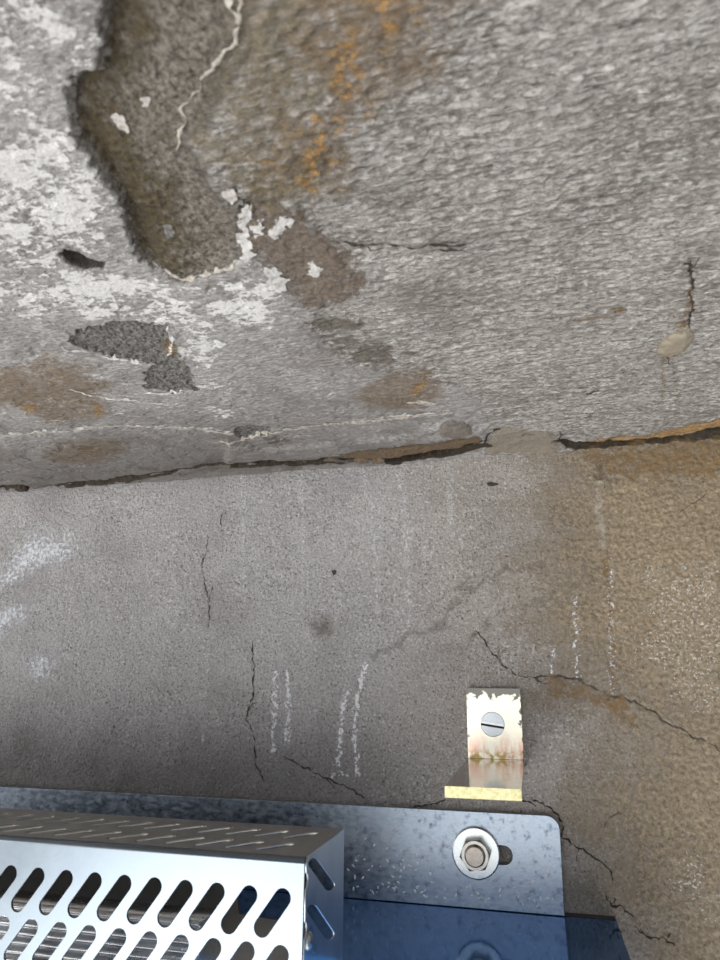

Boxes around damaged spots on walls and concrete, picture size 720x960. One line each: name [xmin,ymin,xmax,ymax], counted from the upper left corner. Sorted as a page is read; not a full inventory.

spalling [0,0,453,446]
crack [684,256,700,332]
crack [0,429,500,492]
crack [553,427,720,450]
crack [201,513,223,627]
crack [246,641,265,782]
crack [476,631,720,752]
crack [283,756,368,801]
crack [412,799,446,808]
crack [522,799,675,945]